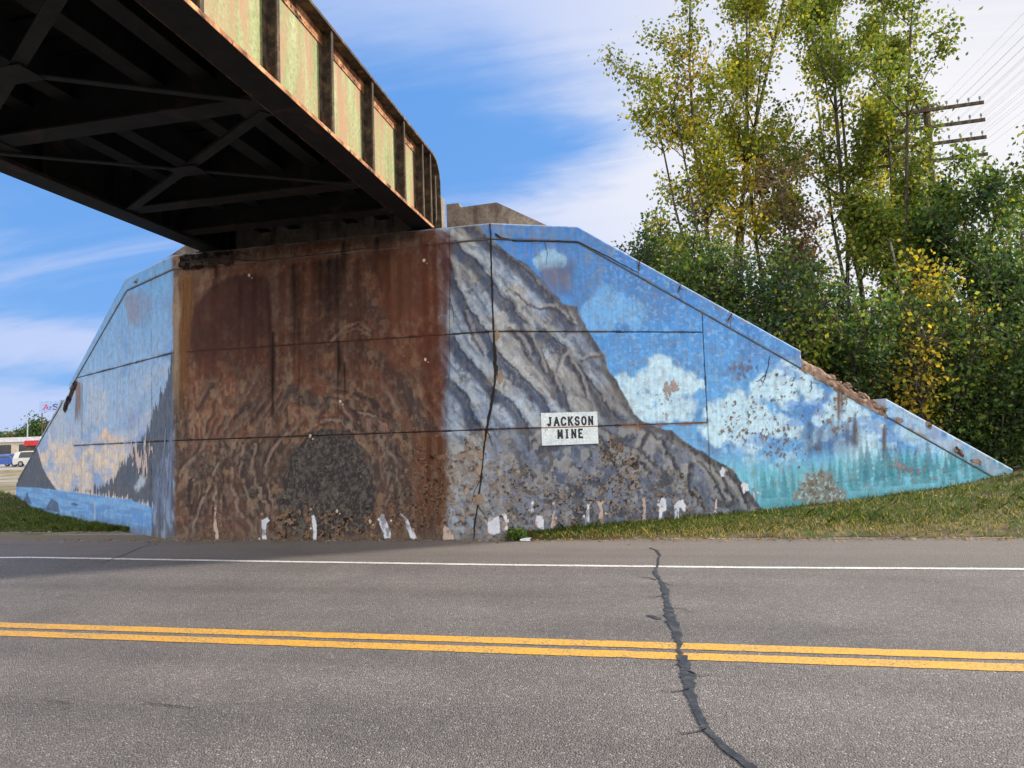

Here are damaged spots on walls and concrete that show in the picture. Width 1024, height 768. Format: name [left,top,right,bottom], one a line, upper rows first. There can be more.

corrosion [180,275,192,382]
crack [471,223,640,539]
spalling [719,359,903,469]
peeling [258,432,717,540]